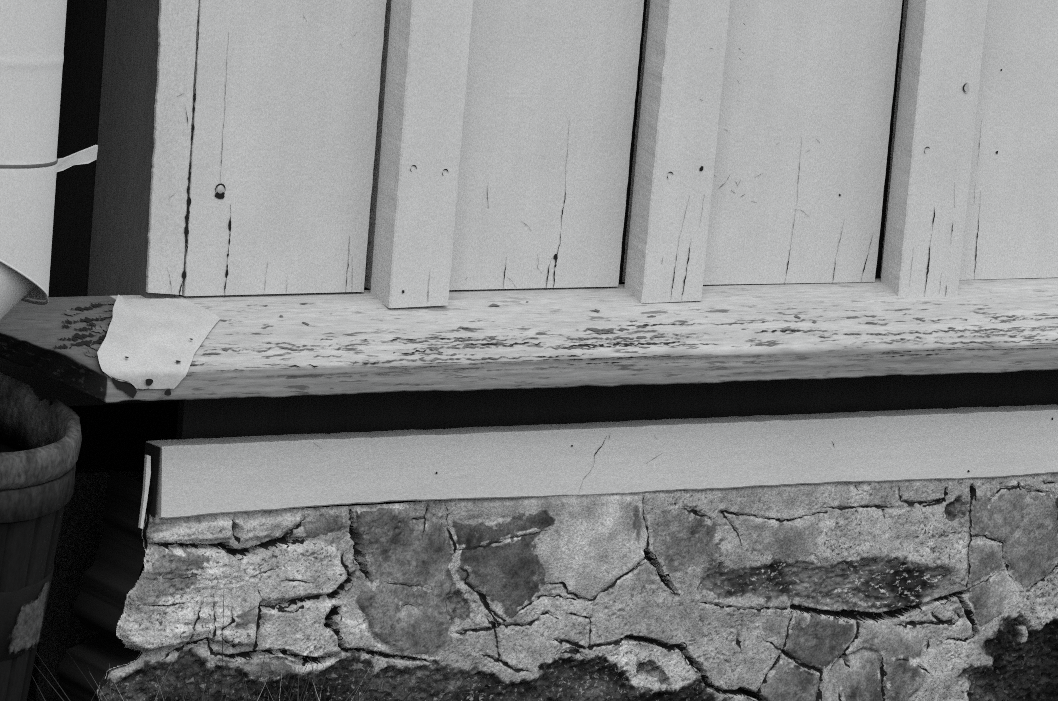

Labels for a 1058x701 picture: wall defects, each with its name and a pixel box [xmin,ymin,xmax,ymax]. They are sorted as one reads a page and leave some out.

peeling [54,301,115,357]
peeling [186,338,354,376]
crack [537,120,570,290]
peeling [530,315,680,349]
crack [247,173,1058,378]
crack [910,123,982,297]
peeling [903,313,1023,337]
crack [147,508,435,666]
crack [412,481,1058,701]